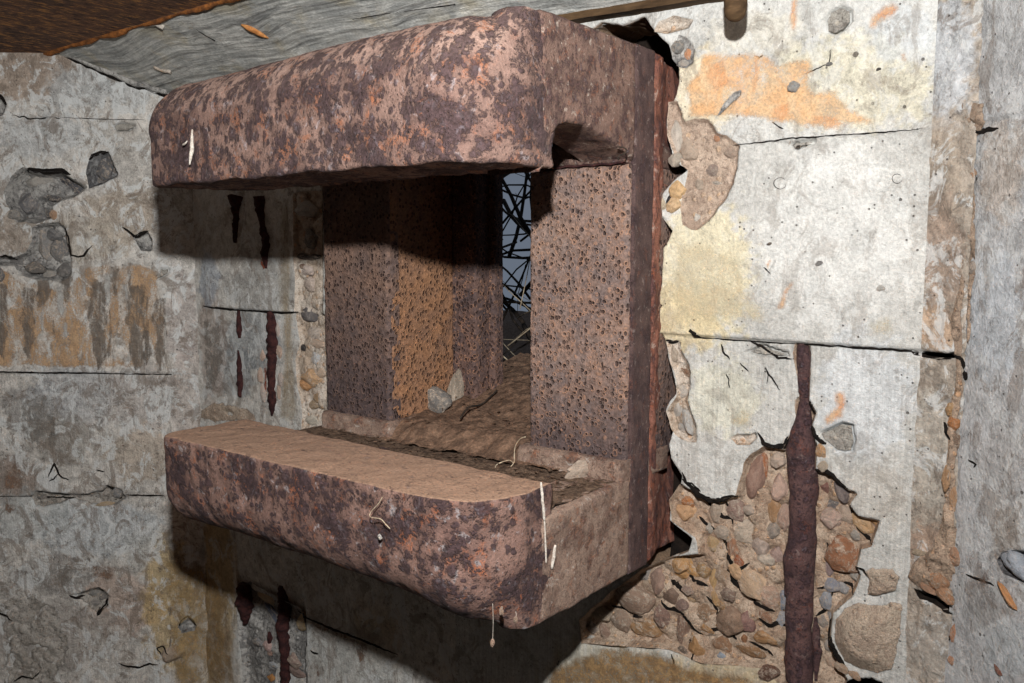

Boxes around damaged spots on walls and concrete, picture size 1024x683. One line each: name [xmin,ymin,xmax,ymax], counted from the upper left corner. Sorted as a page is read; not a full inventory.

rust [687,55,864,127]
spalling [661,90,741,230]
crack [734,122,917,146]
spalling [0,151,118,282]
crack [666,329,912,390]
crack [952,352,968,380]
spalling [579,341,883,683]